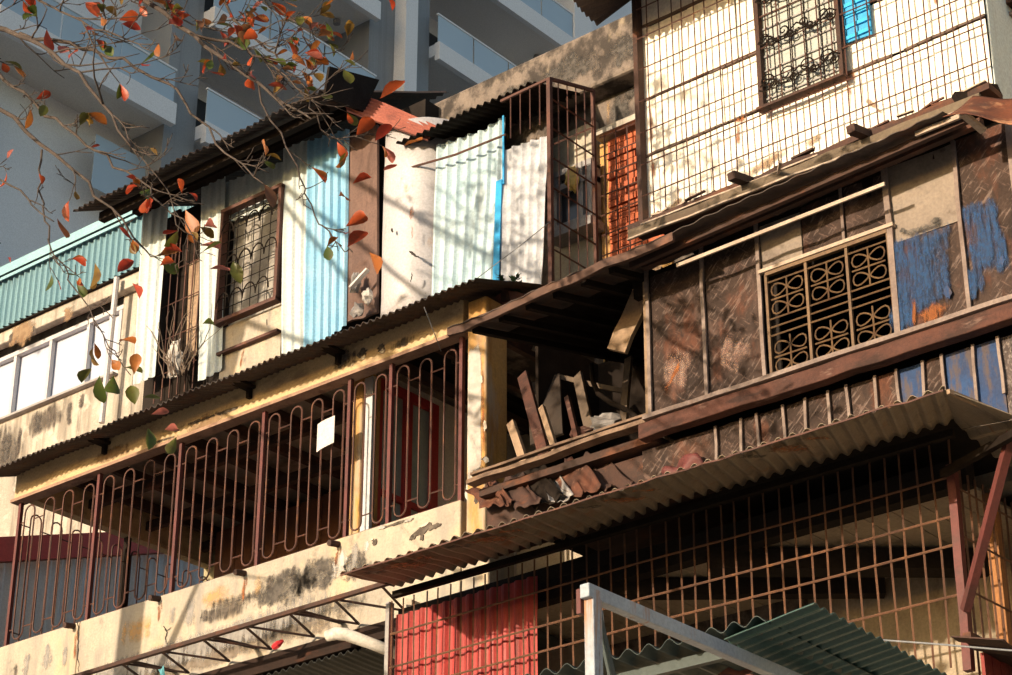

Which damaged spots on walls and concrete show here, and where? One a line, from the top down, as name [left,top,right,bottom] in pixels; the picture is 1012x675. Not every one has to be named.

water stain [545,35,633,83]
water stain [610,87,634,122]
rust [943,96,1012,125]
peeling [889,225,952,330]
peeling [963,198,1007,299]
water stain [0,394,83,465]
peeling [465,346,489,504]
spalling [371,518,442,546]
water stain [94,542,371,675]